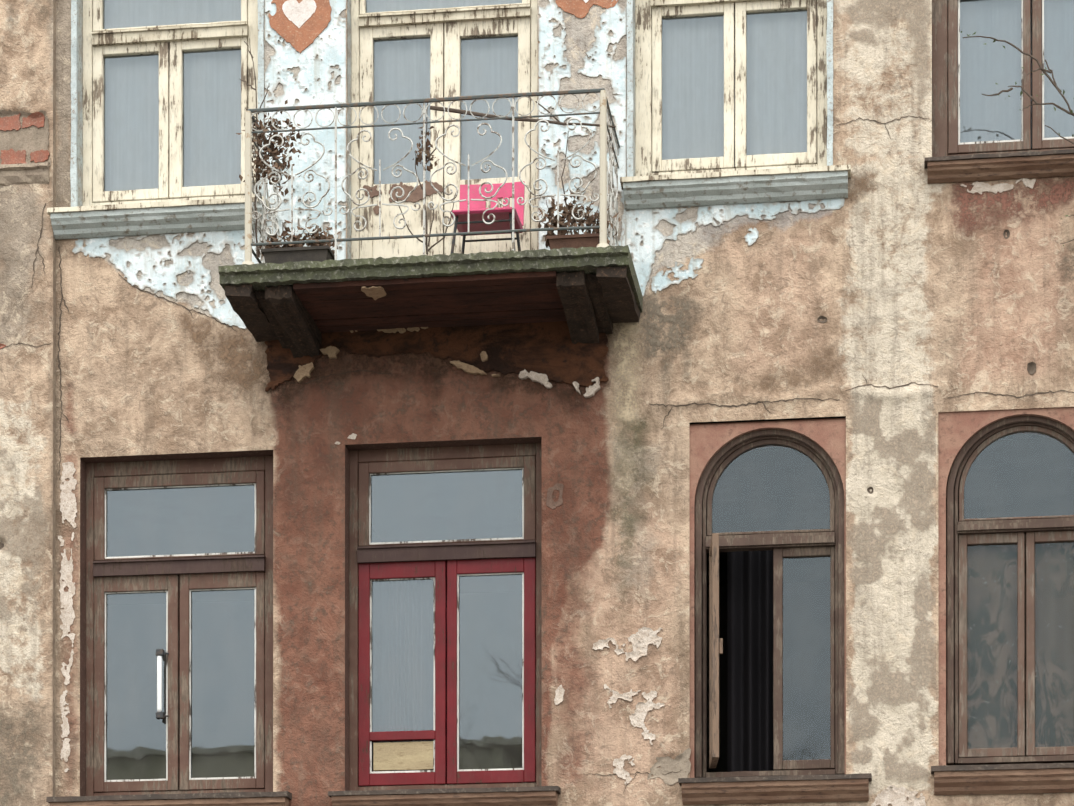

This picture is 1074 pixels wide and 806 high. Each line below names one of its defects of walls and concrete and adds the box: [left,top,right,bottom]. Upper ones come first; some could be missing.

peeling [72,0,346,329]
peeling [538,0,845,296]
crack [836,115,928,139]
peeling [363,180,444,215]
crack [5,203,69,480]
flaking render [519,369,552,389]
flaking render [573,377,600,398]
crack [649,376,1074,430]
peeling [58,462,78,772]
flaking render [592,627,662,662]
flaking render [604,684,665,745]
flaking render [849,575,936,806]